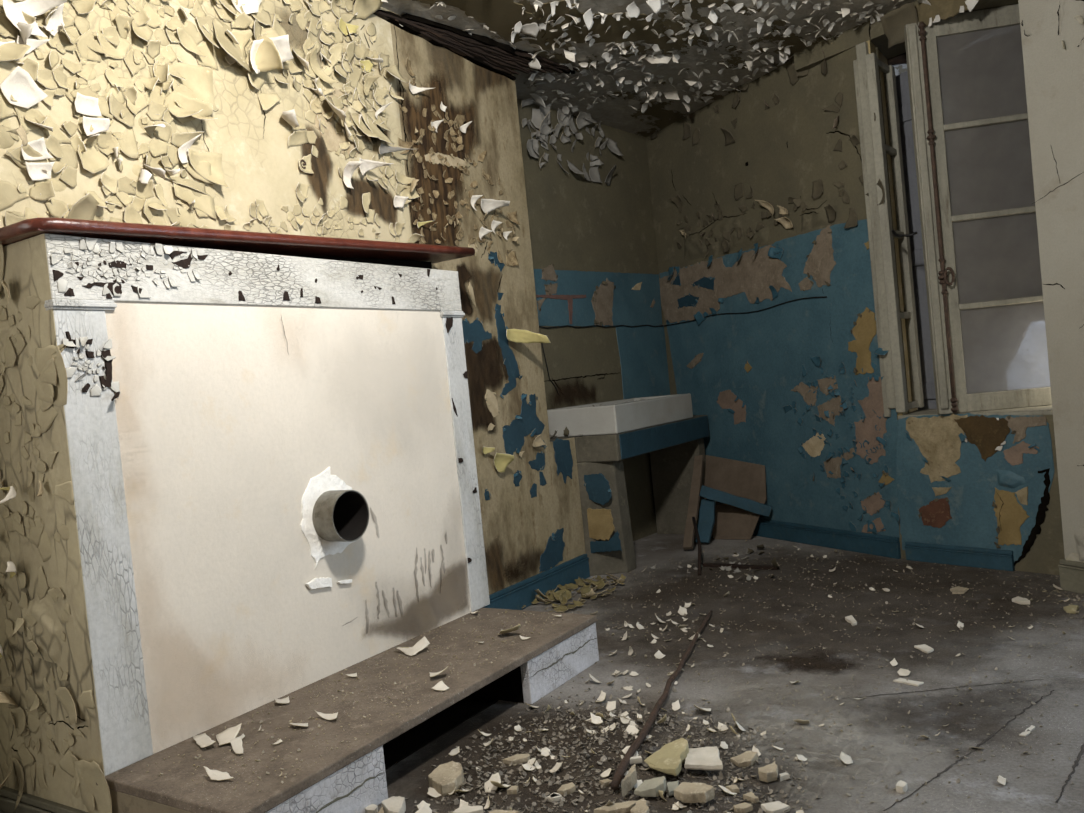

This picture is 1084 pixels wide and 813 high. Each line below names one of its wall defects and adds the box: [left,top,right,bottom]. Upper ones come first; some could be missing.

crack [1057,0,1084,47]
peeling [0,0,520,267]
crack [1034,147,1082,203]
flaking render [650,92,860,326]
peeling [50,237,208,299]
peeling [283,288,321,304]
peeling [445,282,484,333]
peeling [505,326,551,344]
flaking render [790,307,894,533]
flaking render [906,413,1047,528]
peeling [0,244,120,813]
leakage [774,655,853,673]